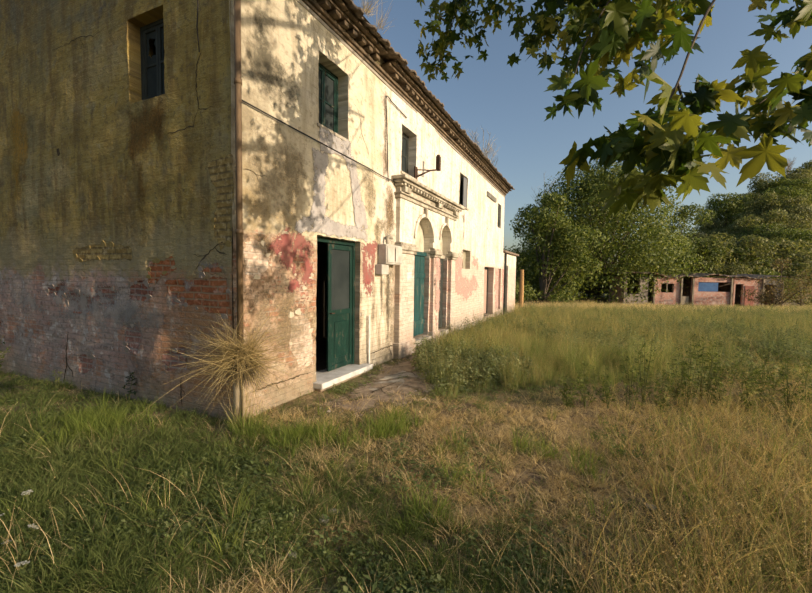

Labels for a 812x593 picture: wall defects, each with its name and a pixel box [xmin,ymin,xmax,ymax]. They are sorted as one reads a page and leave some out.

water stain [250,8,284,88]
crack [168,53,213,134]
spalling [46,281,117,315]
spalling [130,256,232,321]
peeling [244,227,314,367]
peeling [361,241,377,296]